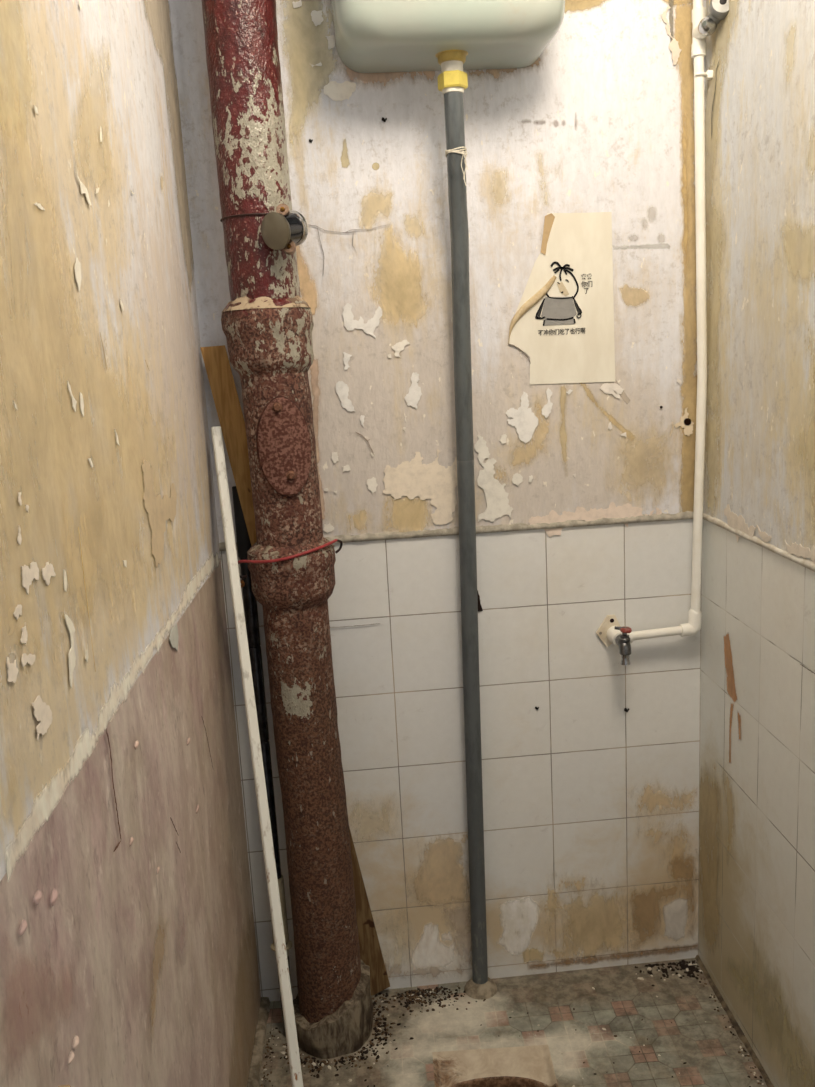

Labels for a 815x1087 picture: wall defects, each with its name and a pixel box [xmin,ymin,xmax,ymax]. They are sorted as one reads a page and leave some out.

peeling [342,303,382,338]
peeling [336,352,365,427]
peeling [403,372,422,431]
peeling [500,388,553,444]
peeling [674,407,694,436]
peeling [367,450,457,525]
peeling [474,435,533,522]
peeling [528,502,662,537]
peeling [6,552,220,880]
rust [724,634,741,762]
leakage [415,837,471,972]
leakage [548,836,694,957]